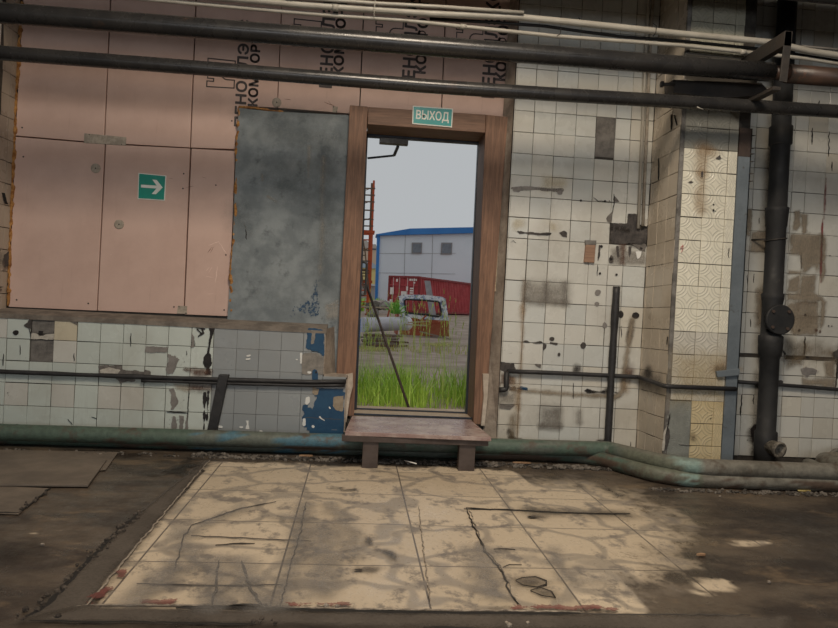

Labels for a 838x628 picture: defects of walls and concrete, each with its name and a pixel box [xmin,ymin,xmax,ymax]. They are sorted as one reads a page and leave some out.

spalling [596,196,648,275]
peeling [13,319,55,362]
peeling [296,328,353,434]
crack [17,459,750,628]